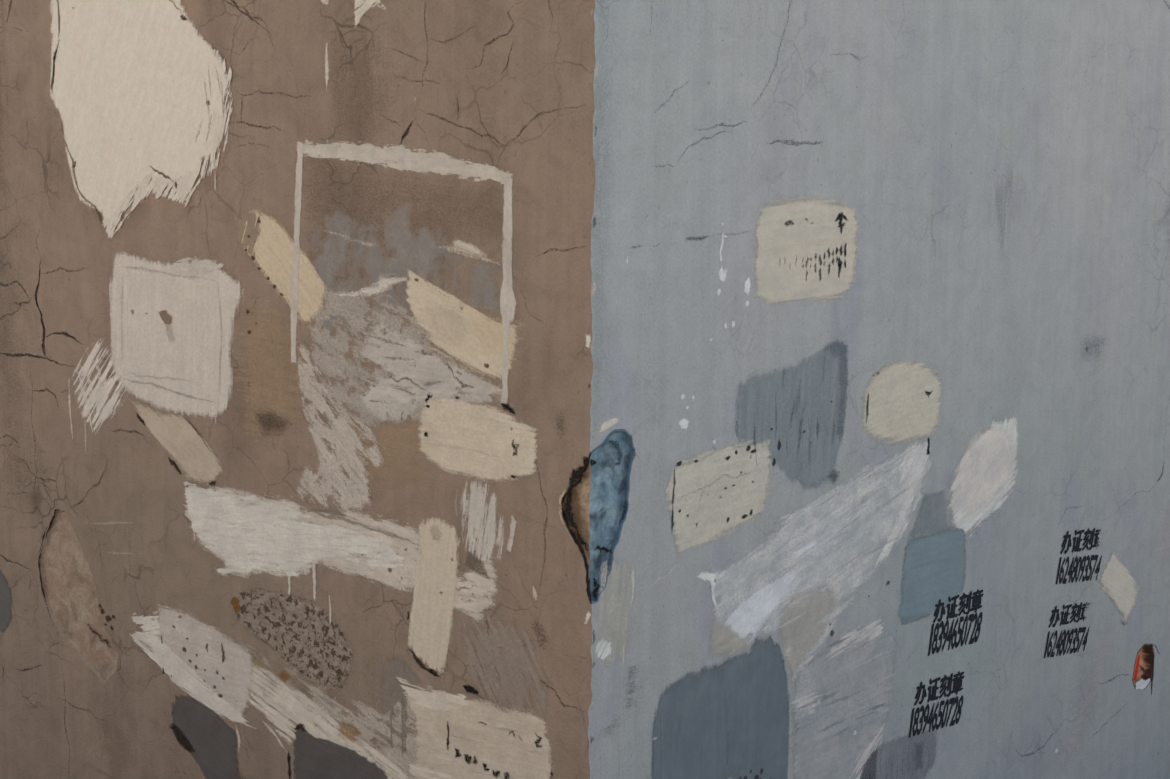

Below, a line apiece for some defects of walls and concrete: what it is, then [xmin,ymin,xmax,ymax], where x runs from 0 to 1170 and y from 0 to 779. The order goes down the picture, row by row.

crack [51,1,61,90]
crack [60,119,103,223]
crack [169,0,273,55]
crack [233,88,305,147]
crack [384,2,582,146]
crack [656,1,792,168]
crack [0,226,148,582]
crack [535,462,548,593]
spalling [559,429,636,604]
crack [2,664,107,778]
flaking render [1132,644,1160,695]